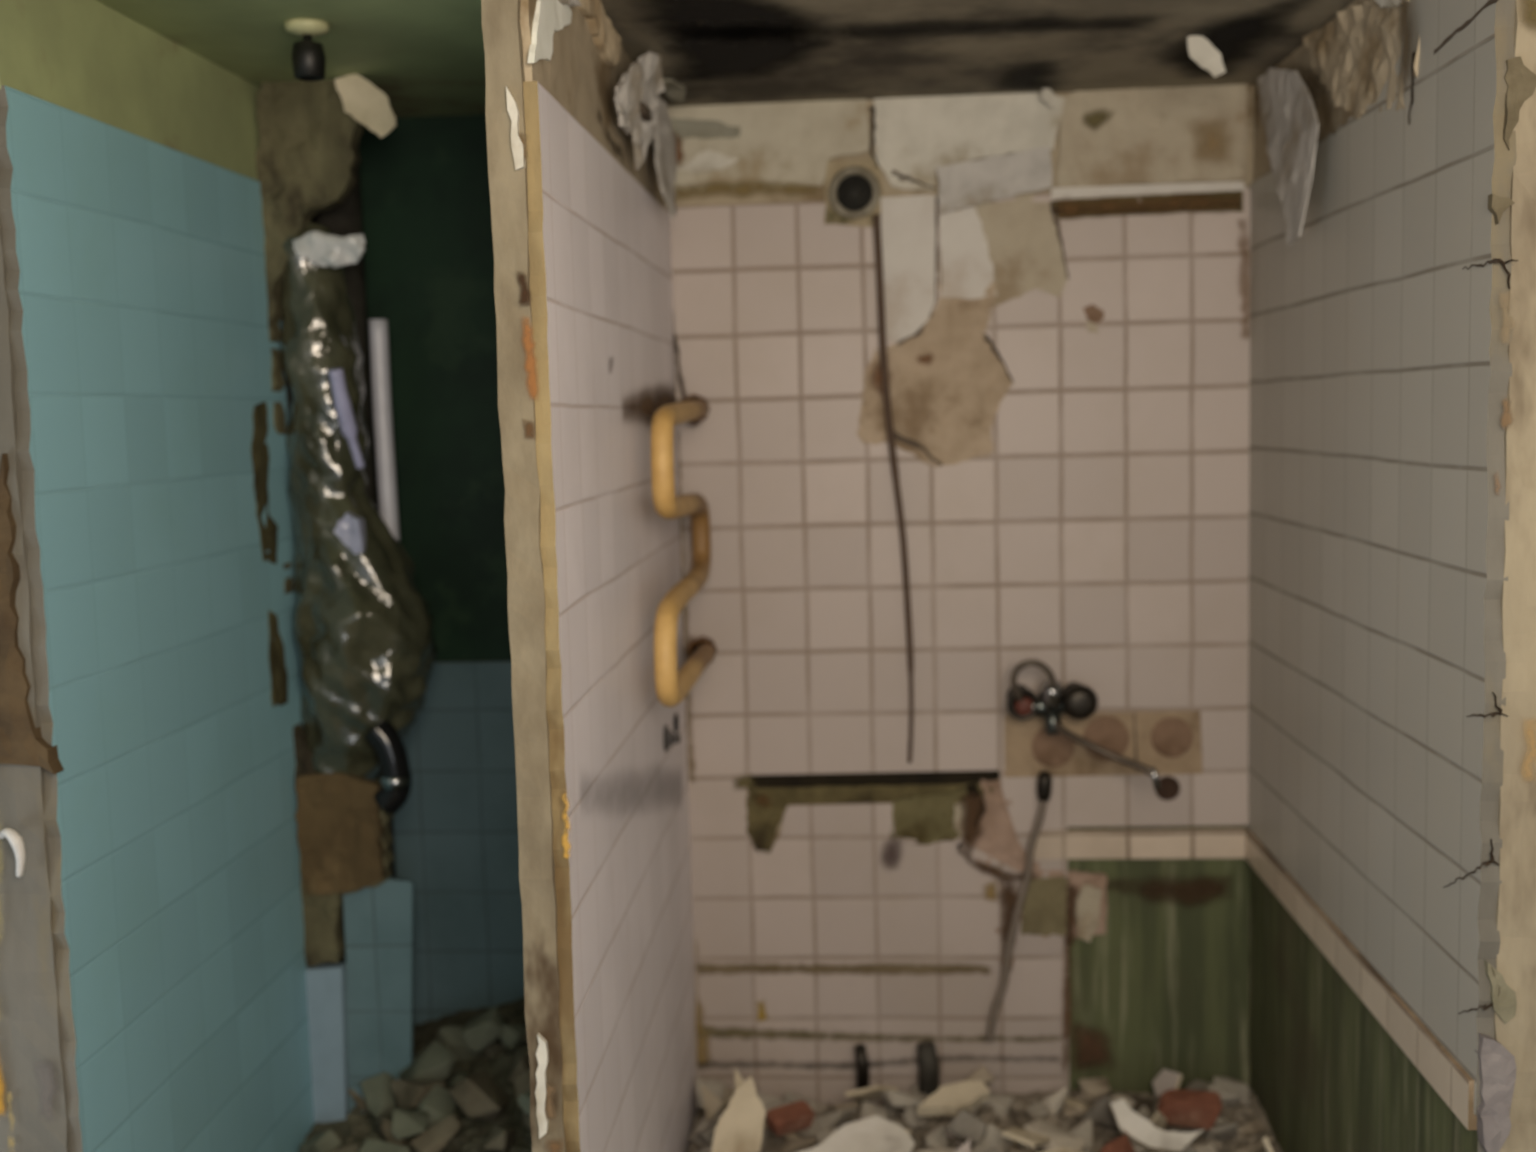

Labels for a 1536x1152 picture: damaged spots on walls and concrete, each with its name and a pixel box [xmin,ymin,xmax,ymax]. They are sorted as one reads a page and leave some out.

spalling [1301,0,1420,119]
spalling [663,35,1248,467]
crack [1463,258,1519,289]
spalling [251,74,397,594]
spalling [268,611,288,707]
crack [1466,692,1508,718]
spalling [293,723,315,809]
spalling [299,807,395,967]
spalling [745,792,788,854]
crack [1443,838,1500,888]